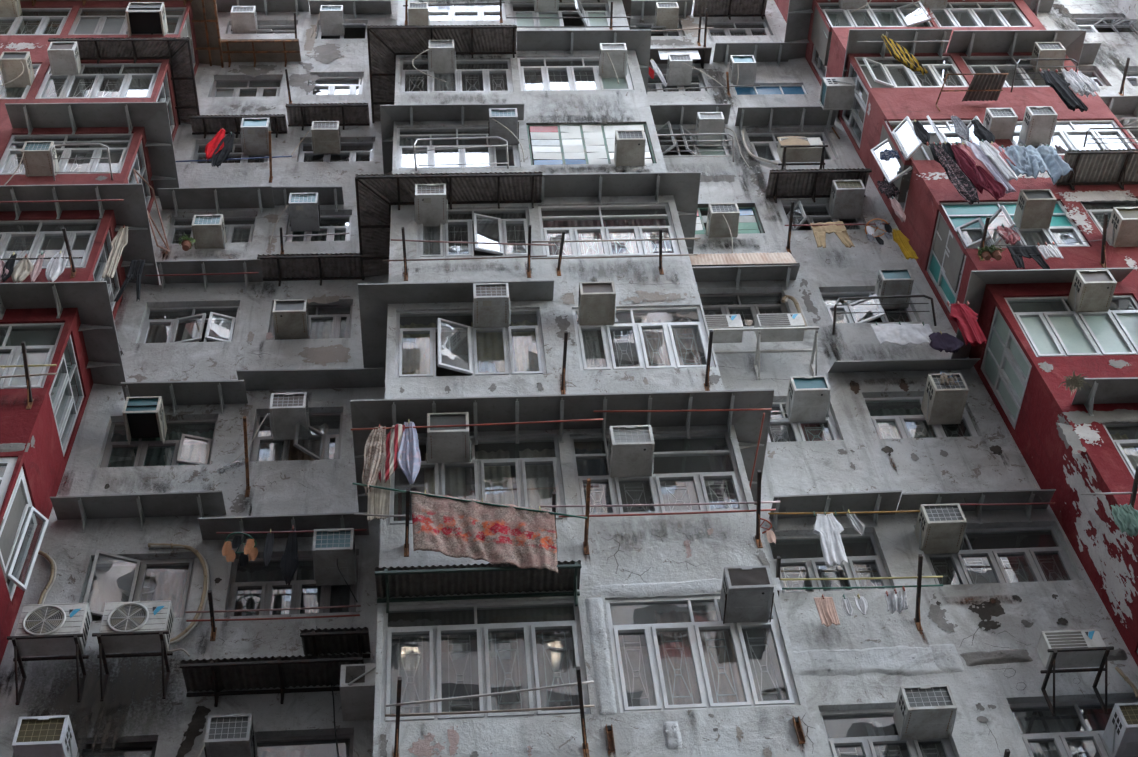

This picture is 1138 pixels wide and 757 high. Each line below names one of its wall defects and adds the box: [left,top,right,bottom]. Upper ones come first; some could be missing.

peeling [1059,190,1138,234]
peeling [1056,409,1138,628]
crack [602,533,705,583]
peeling [407,726,479,757]